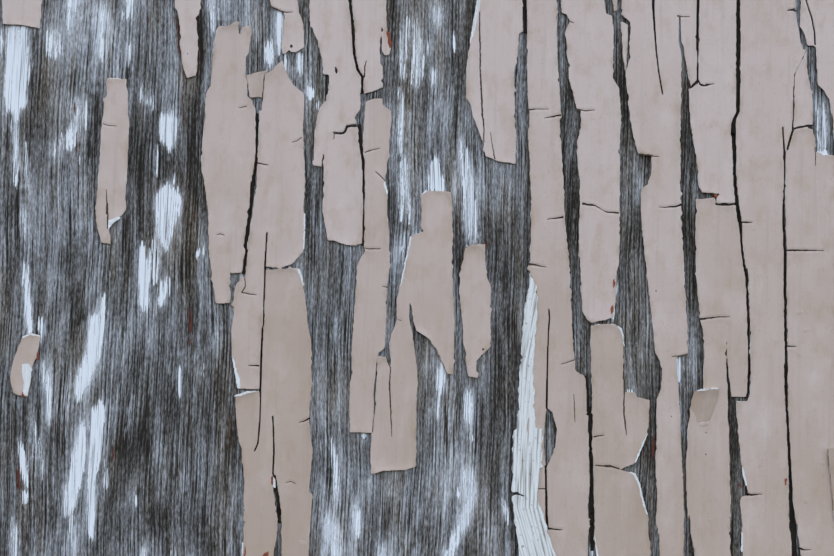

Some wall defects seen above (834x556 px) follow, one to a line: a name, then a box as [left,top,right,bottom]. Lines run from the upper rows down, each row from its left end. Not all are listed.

peeling [1,0,43,28]
peeling [10,333,41,397]
peeling [95,78,130,245]
peeling [175,0,201,78]
crack [238,106,296,523]
peeling [201,0,492,556]
crack [335,0,367,94]
crack [334,124,386,249]
crack [546,309,620,551]
peeling [466,0,834,556]
crack [715,0,752,399]
crack [782,74,824,556]